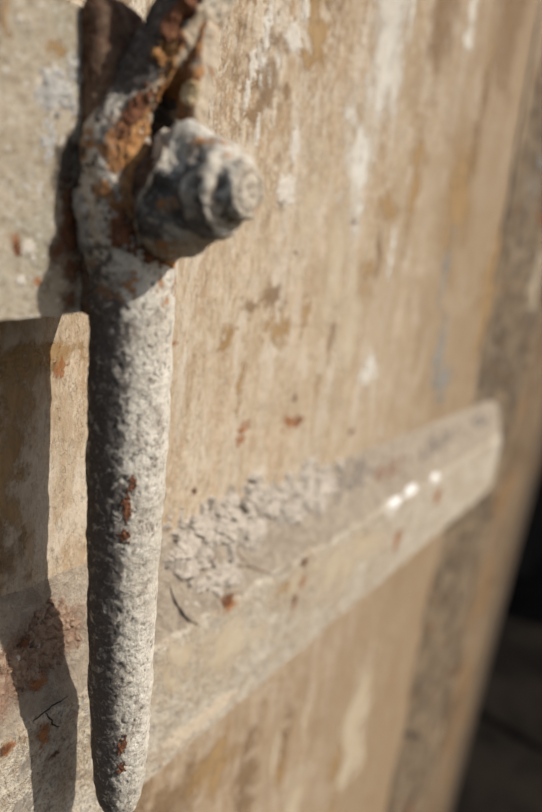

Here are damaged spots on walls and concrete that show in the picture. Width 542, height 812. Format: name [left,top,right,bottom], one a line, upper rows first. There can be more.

rust [116,474,137,545]
spalling [161,455,409,608]
rust [1,741,16,757]
rust [116,734,127,774]